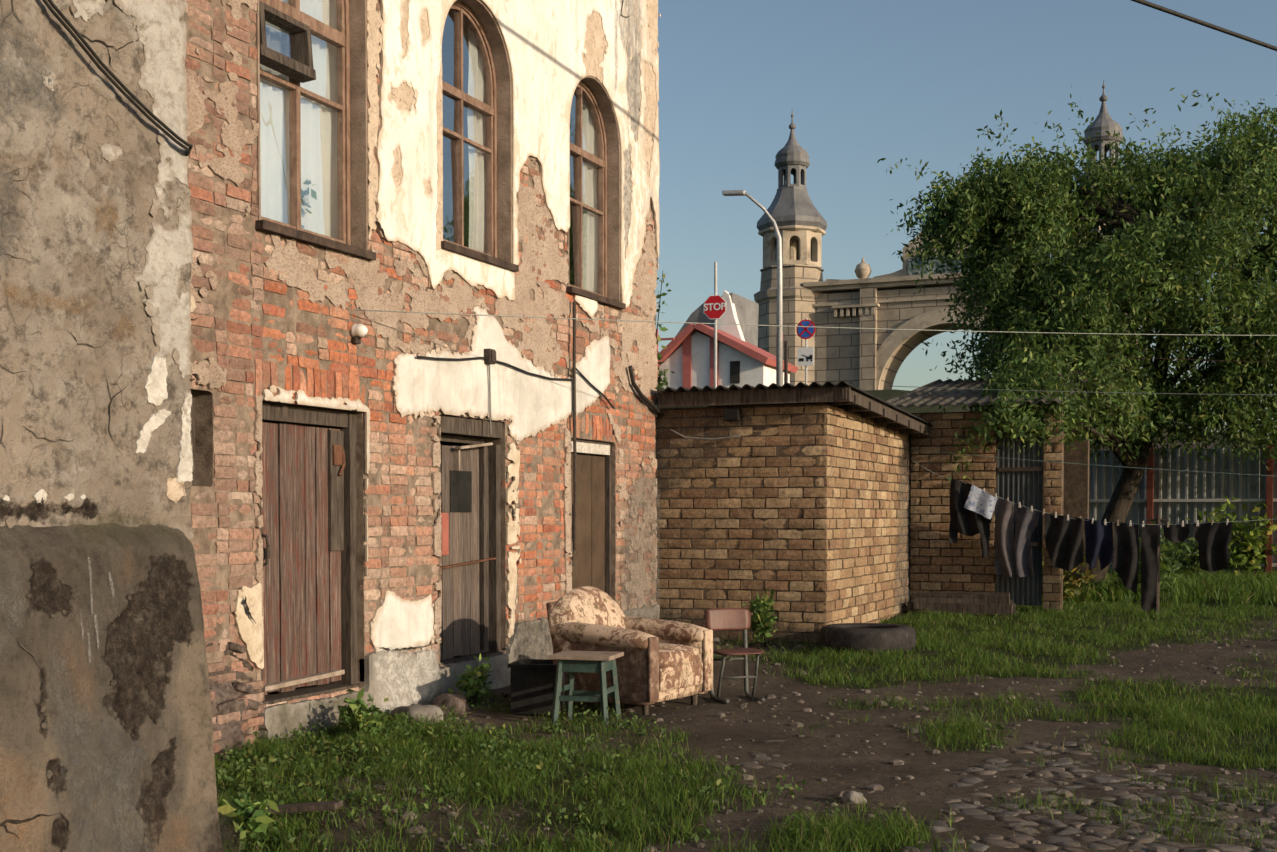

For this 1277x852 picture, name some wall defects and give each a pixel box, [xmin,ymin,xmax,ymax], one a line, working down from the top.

peeling [70,0,259,504]
peeling [233,385,370,669]
spalling [263,0,668,713]
crack [0,813,71,839]